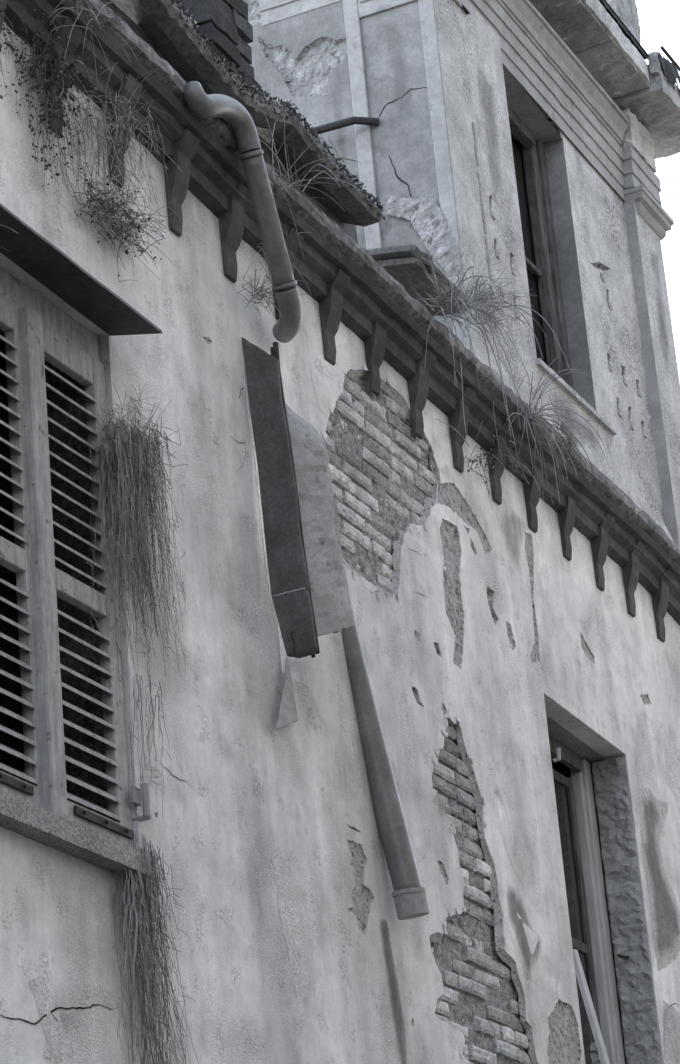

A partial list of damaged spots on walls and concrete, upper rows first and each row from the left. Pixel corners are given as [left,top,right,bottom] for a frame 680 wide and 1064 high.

peeling [243,0,262,25]
peeling [259,37,348,97]
crack [378,87,427,118]
crack [389,156,412,198]
flaking render [321,363,492,669]
flaking render [347,840,374,935]
flaking render [429,703,581,1064]
crack [0,1004,113,1025]